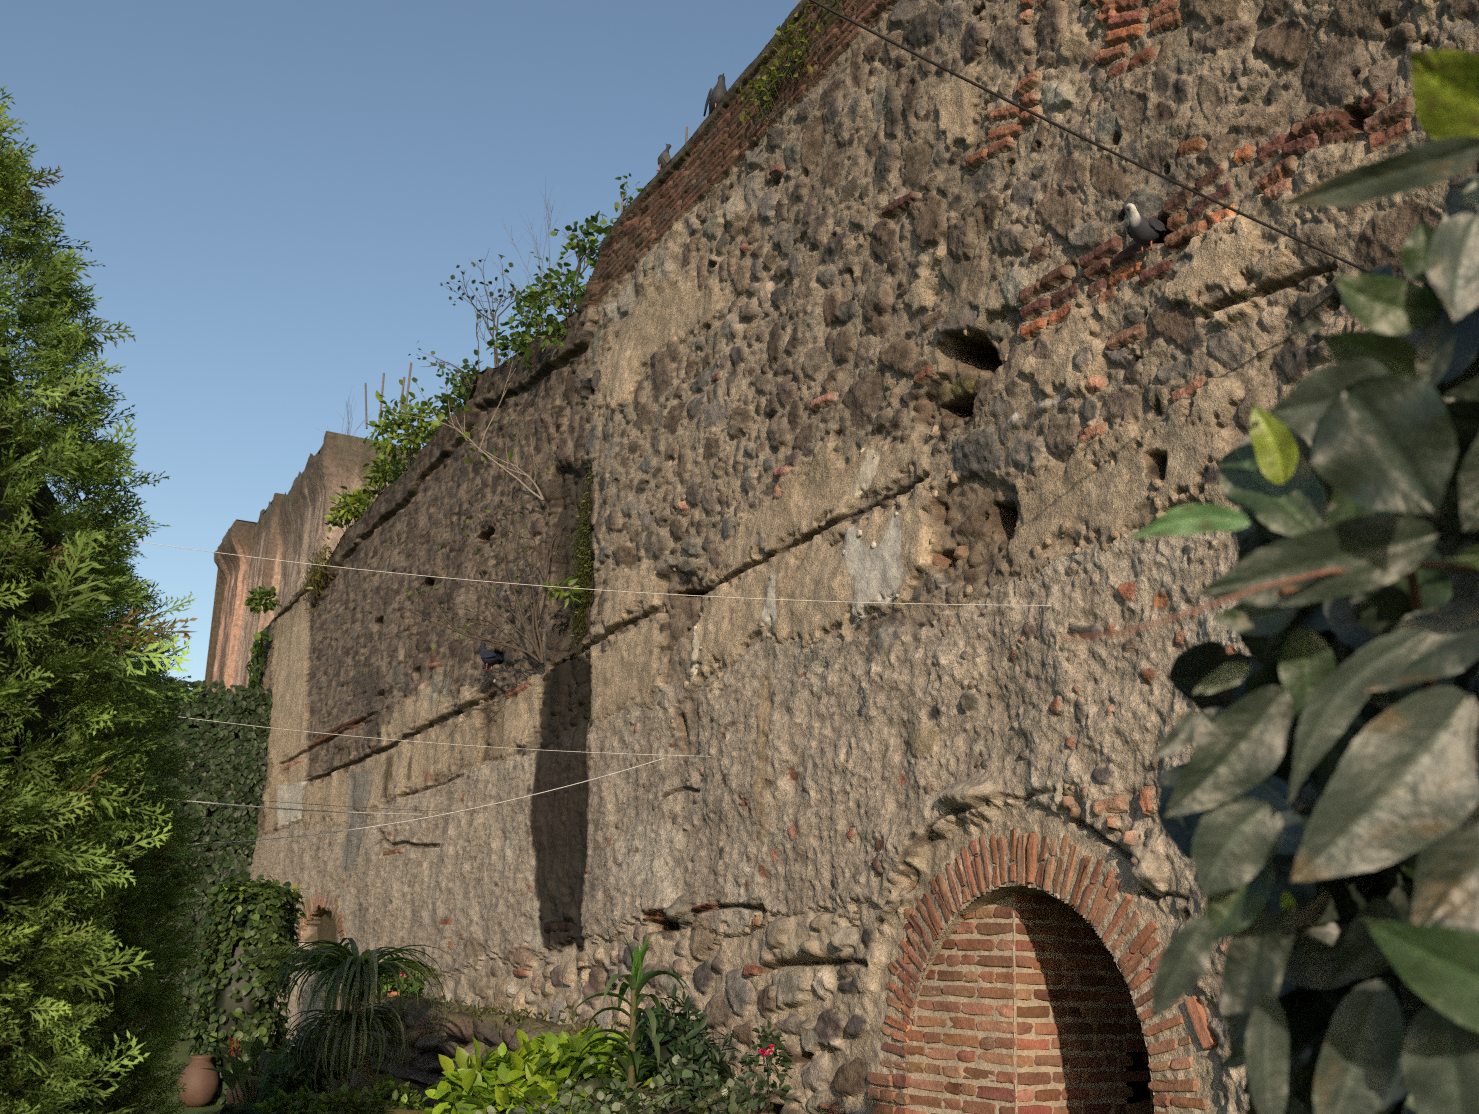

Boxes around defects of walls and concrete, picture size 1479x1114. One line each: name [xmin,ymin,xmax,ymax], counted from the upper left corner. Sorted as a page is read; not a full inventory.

crack [705,475,929,595]
peeling [842,512,904,626]
crack [555,608,663,666]
crack [281,701,488,784]
crack [643,900,767,928]